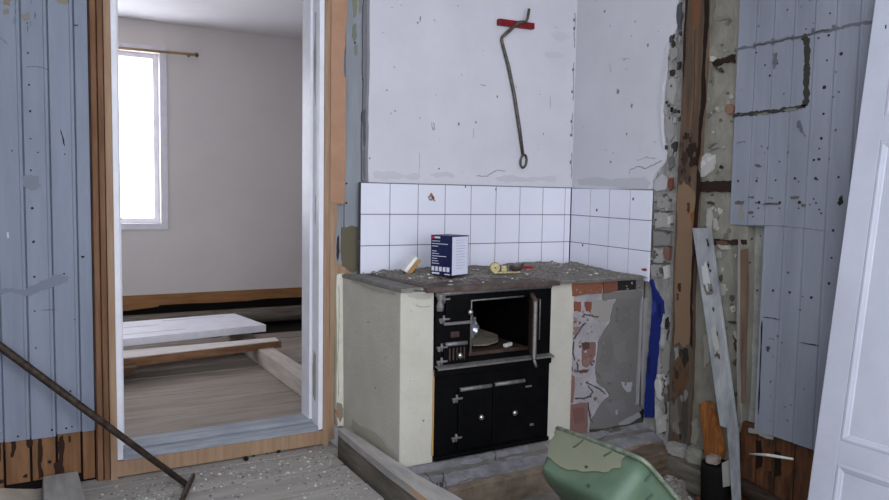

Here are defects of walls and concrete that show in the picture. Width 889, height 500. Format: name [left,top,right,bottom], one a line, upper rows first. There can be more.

peeling [700,153,716,177]
flaking render [570,0,685,446]
peeling [706,207,718,229]